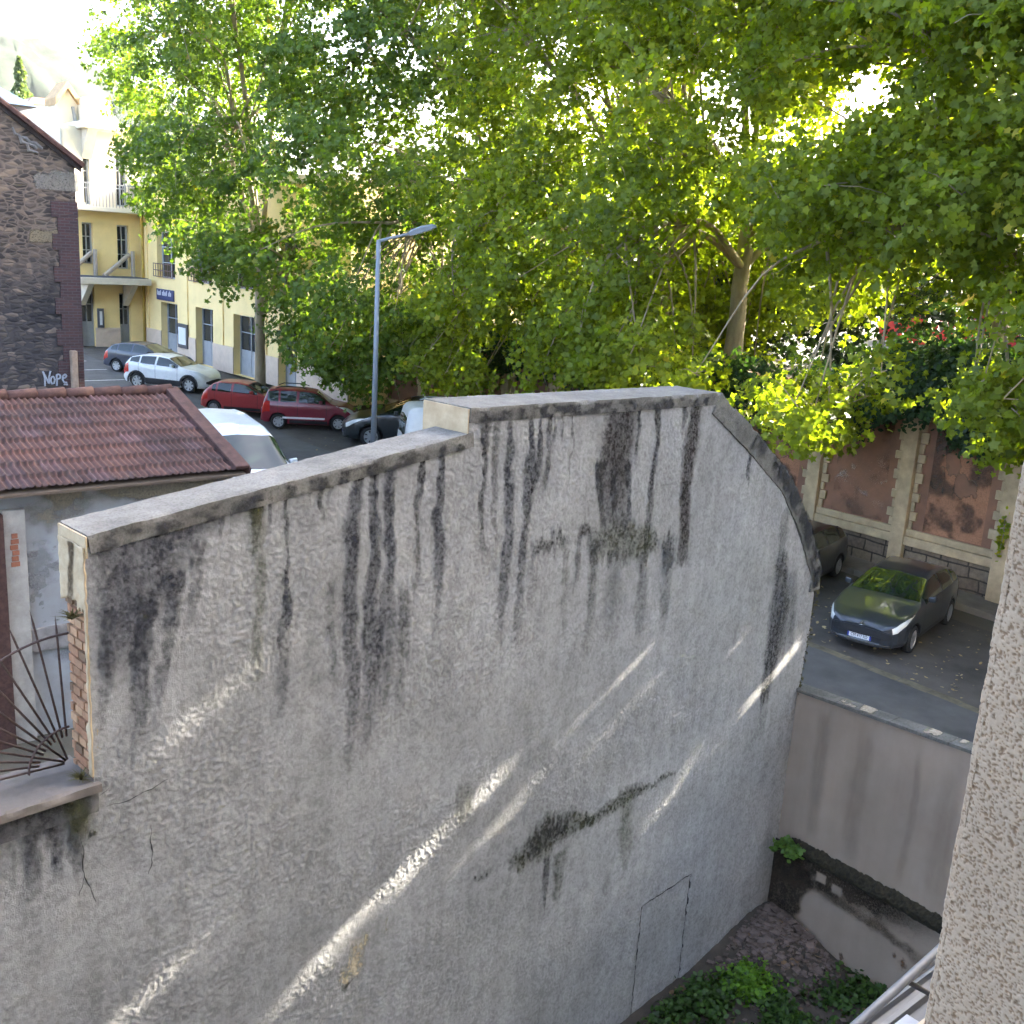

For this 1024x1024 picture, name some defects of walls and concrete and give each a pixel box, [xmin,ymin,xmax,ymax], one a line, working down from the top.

leakage [414,457,445,576]
leakage [478,416,574,599]
leakage [595,462,631,521]
leakage [646,409,661,531]
leakage [664,406,701,588]
leakage [97,516,224,721]
leakage [329,470,409,698]
leakage [762,558,793,700]
leakage [581,774,673,830]
crack [79,838,96,901]
leakage [767,838,915,960]